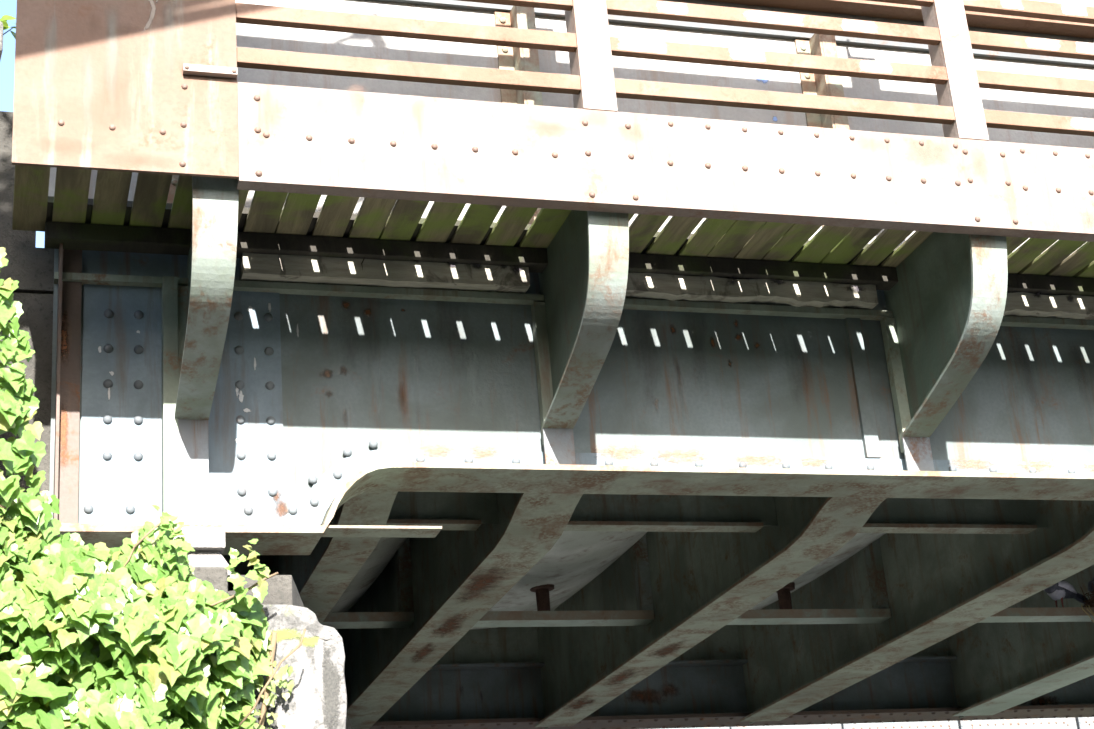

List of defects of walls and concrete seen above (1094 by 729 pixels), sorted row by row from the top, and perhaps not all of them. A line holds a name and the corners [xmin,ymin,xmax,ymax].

rust [601,446,708,463]
rust [462,569,503,602]
rust [415,618,462,661]
rust [654,644,680,656]
rust [1031,696,1058,706]